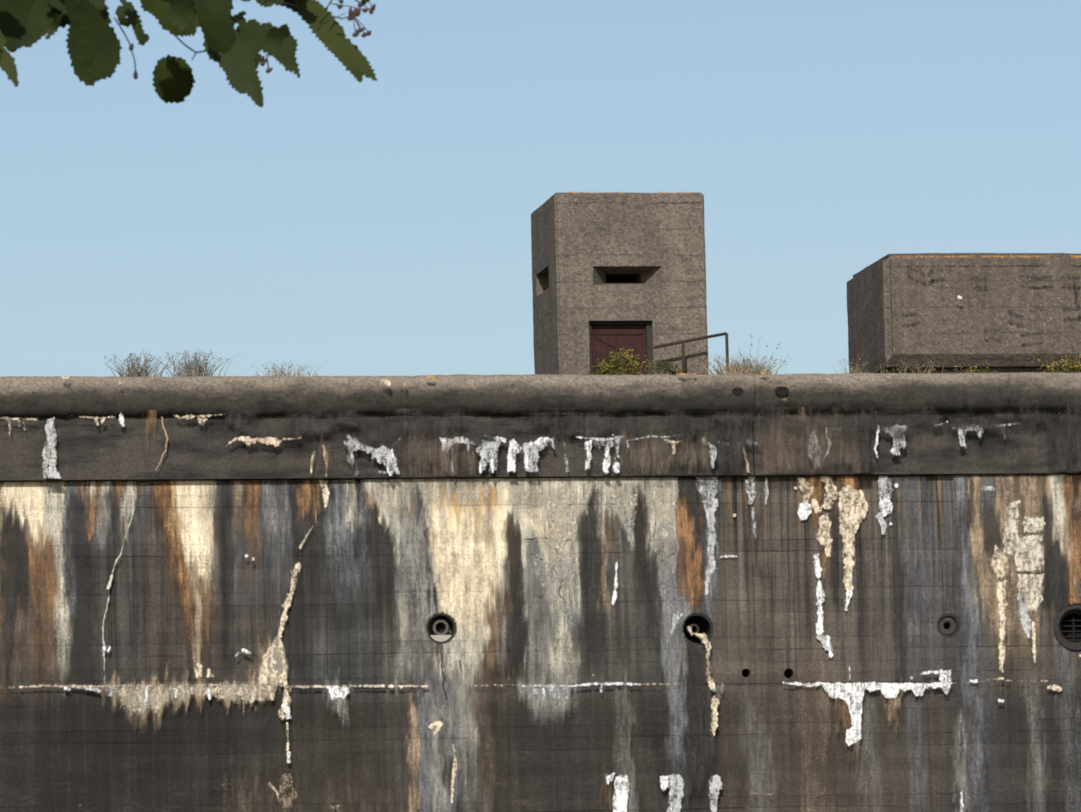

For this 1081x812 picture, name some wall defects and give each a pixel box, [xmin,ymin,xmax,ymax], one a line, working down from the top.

rust [0,481,220,706]
peeling [344,435,399,476]
water stain [1,407,755,812]
rust [676,477,708,606]
peeling [884,424,908,455]
water stain [745,406,1055,812]
peeling [910,669,952,694]
peeling [967,474,1046,673]